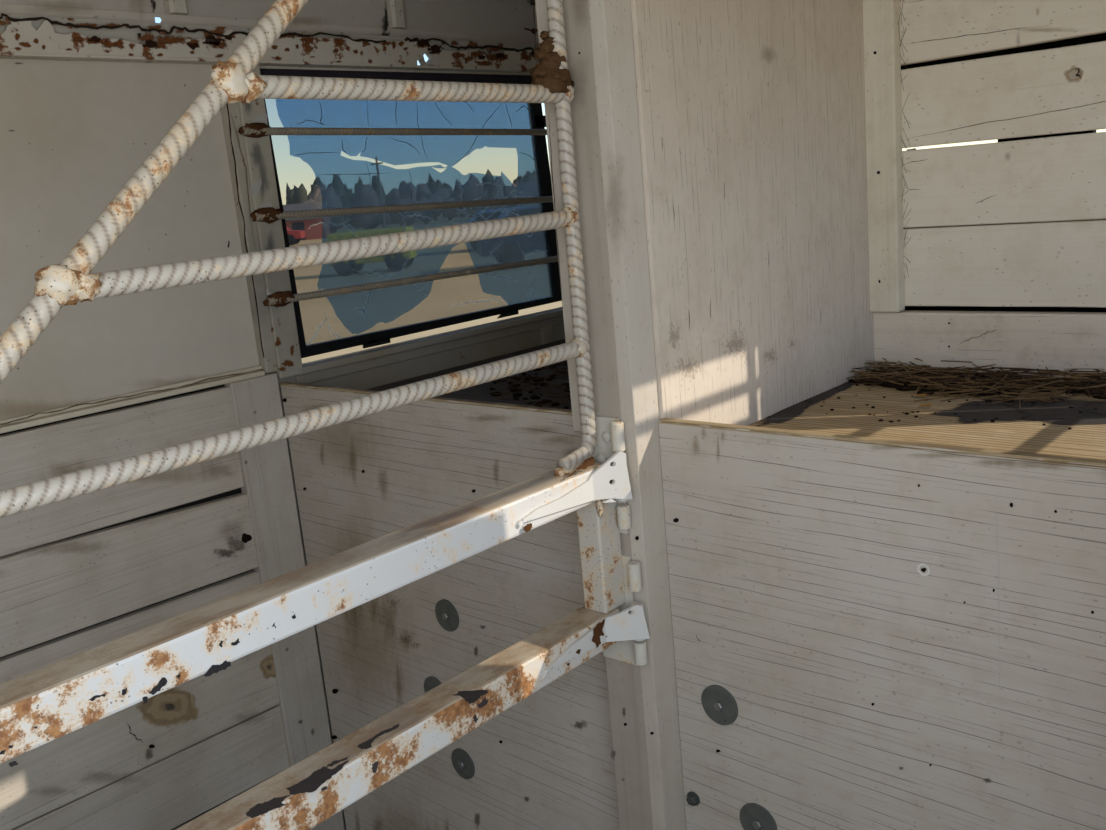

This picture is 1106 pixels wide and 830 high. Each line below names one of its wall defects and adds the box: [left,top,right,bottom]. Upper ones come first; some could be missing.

rust [0,17,45,51]
crack [0,13,249,37]
rust [66,23,235,58]
rust [272,35,428,64]
crack [280,0,537,64]
rust [592,619,607,647]
peeling [204,660,231,677]
peeling [142,673,181,704]
peeling [454,690,488,723]
peeling [357,724,399,749]
peeling [245,757,349,818]